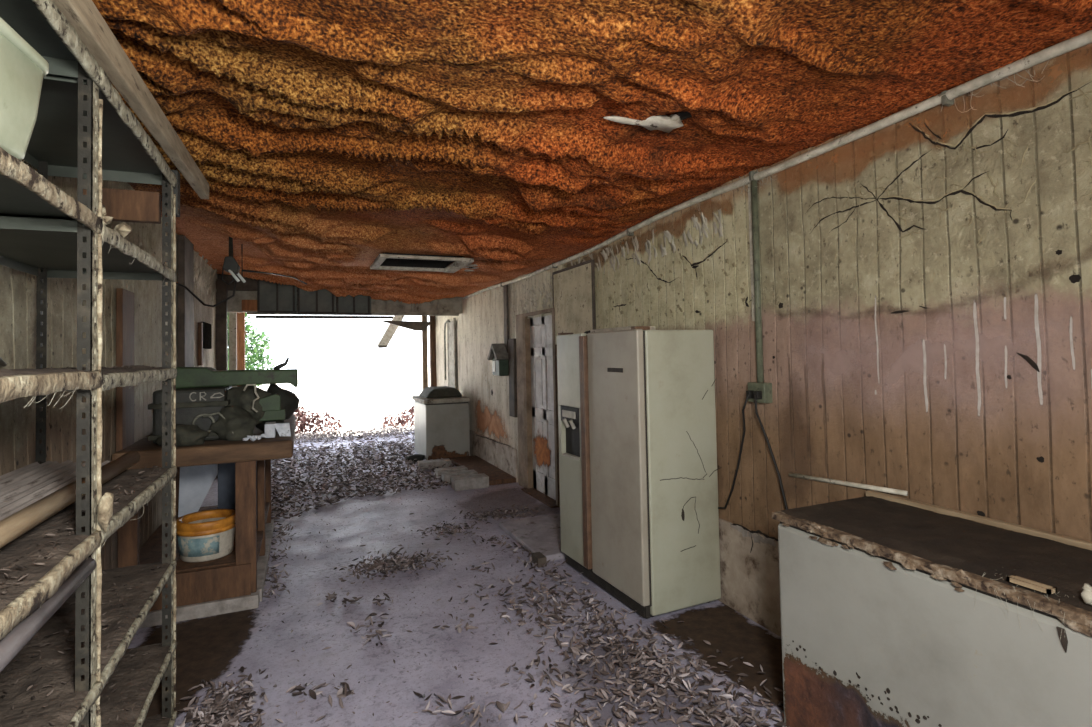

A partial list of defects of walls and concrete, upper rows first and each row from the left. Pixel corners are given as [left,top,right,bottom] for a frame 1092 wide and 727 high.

crack [805,79,1092,233]
crack [627,242,726,283]
corrosion [783,641,942,727]